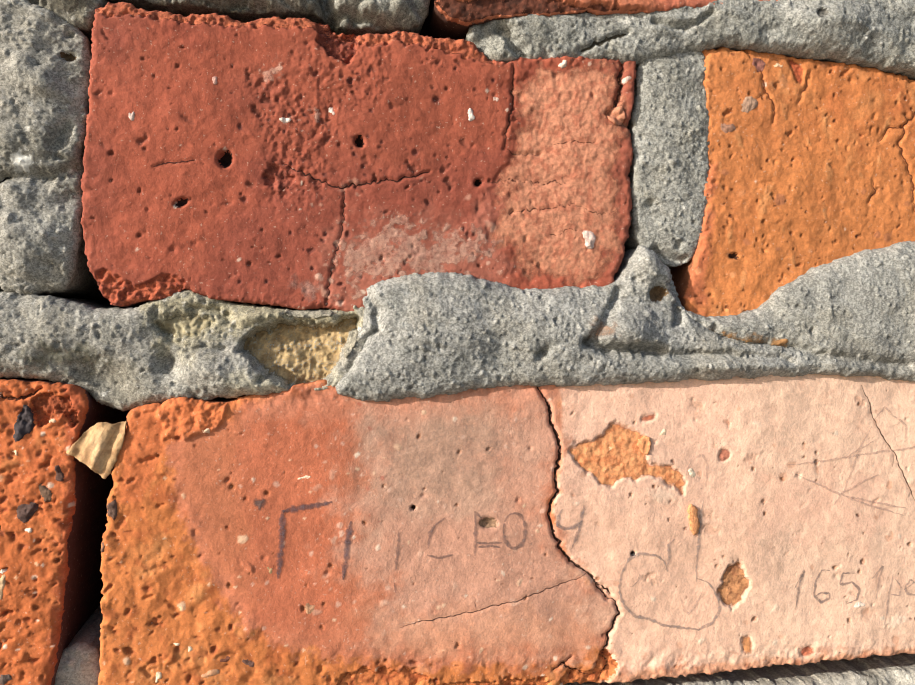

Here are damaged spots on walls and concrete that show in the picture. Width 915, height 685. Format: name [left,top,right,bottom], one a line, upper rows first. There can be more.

crack [880,111,915,208]
crack [284,164,428,297]
spalling [244,309,358,384]
spalling [570,424,684,491]
crack [403,387,620,676]
spalling [687,504,700,535]